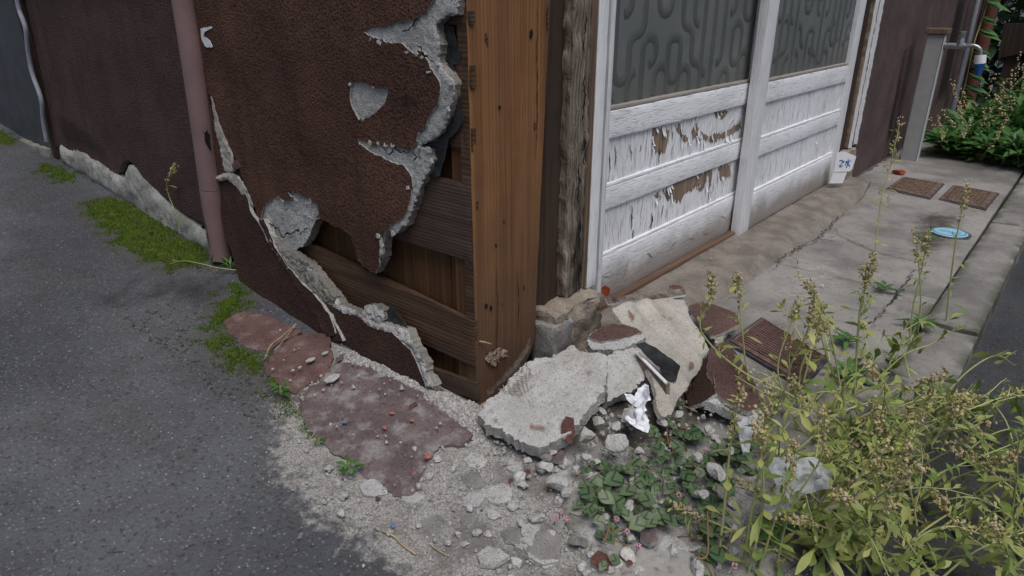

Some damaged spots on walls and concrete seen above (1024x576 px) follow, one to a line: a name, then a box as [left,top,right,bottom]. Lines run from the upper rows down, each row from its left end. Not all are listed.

flaking render [348,82,387,121]
flaking render [360,0,461,257]
peeling [653,160,733,205]
peeling [652,110,742,156]
flaking render [259,193,442,388]
crack [770,211,939,327]